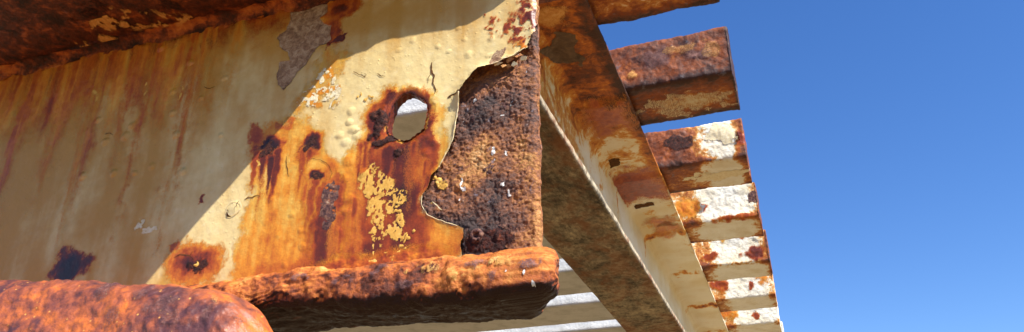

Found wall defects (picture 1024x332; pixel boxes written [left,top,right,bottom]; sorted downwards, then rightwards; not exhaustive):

peeling [276,4,347,90]
peeling [299,67,344,110]
rust [162,0,463,286]
peeling [357,163,416,262]
rust [609,163,760,239]
rust [46,244,96,280]
rust [700,240,725,261]
rust [739,237,768,264]
rust [708,280,731,294]
rust [749,276,771,290]
rust [720,311,760,320]